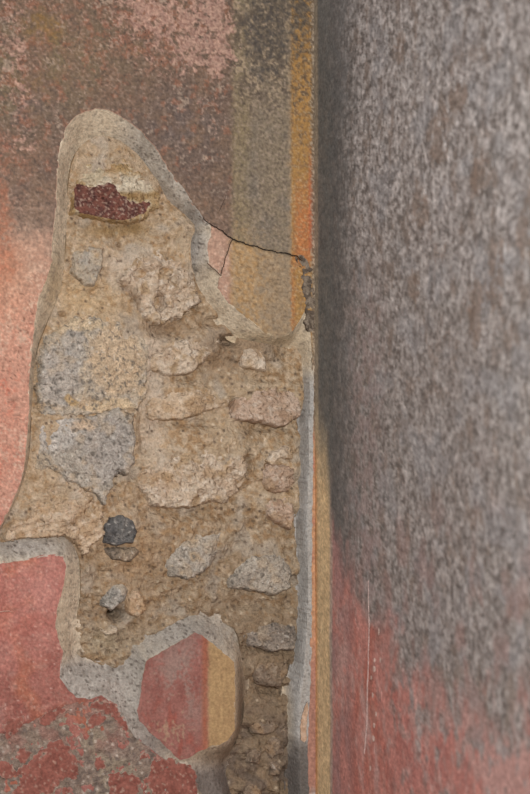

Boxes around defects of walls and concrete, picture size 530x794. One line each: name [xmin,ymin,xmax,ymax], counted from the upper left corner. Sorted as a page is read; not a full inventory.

flaking render [0,109,315,794]
crack [199,195,302,276]